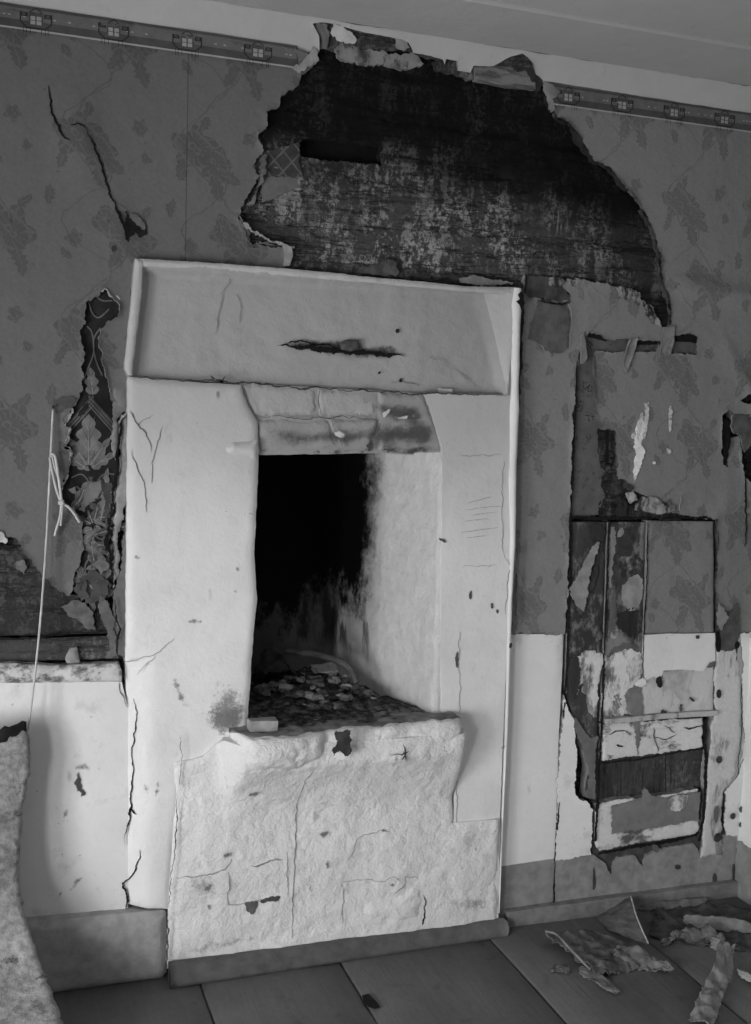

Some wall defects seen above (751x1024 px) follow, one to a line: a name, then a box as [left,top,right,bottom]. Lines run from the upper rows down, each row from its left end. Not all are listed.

crack [48,86,129,242]
spalling [238,22,672,357]
spalling [98,387,127,658]
crack [131,340,506,447]
crack [104,413,173,908]
spalling [332,730,352,760]